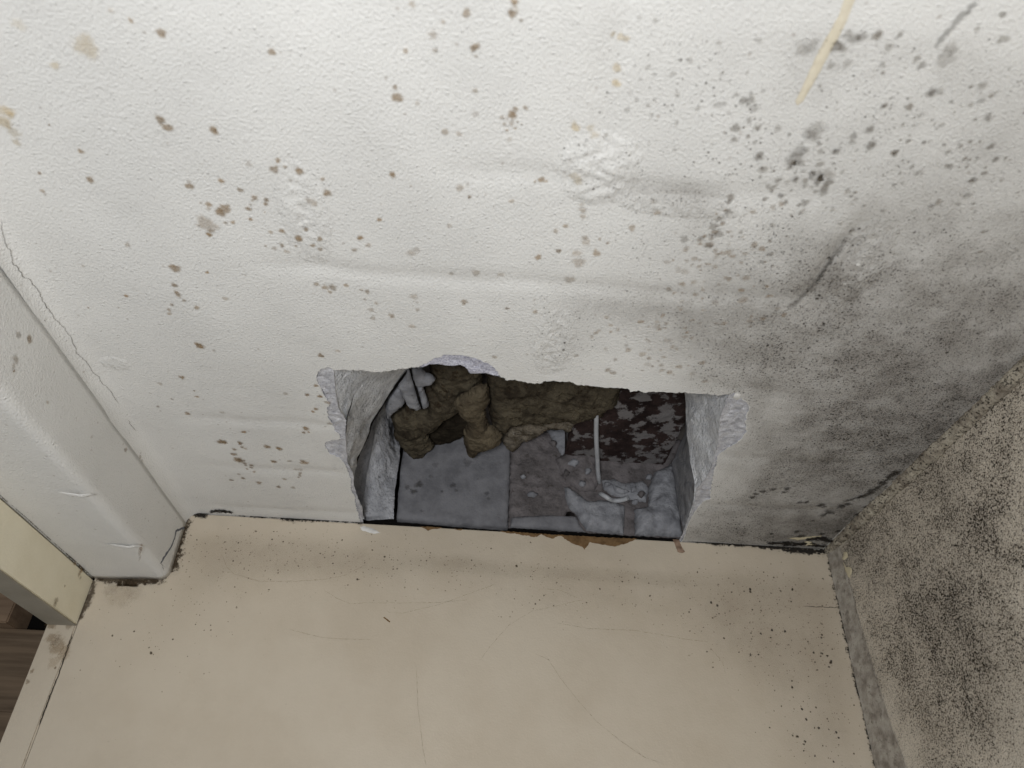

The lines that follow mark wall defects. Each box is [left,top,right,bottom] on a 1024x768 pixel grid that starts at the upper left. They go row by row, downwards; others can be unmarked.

spalling [317,355,504,524]
peeling [501,531,637,550]
leakage [218,150,1024,768]
spalling [672,392,749,541]